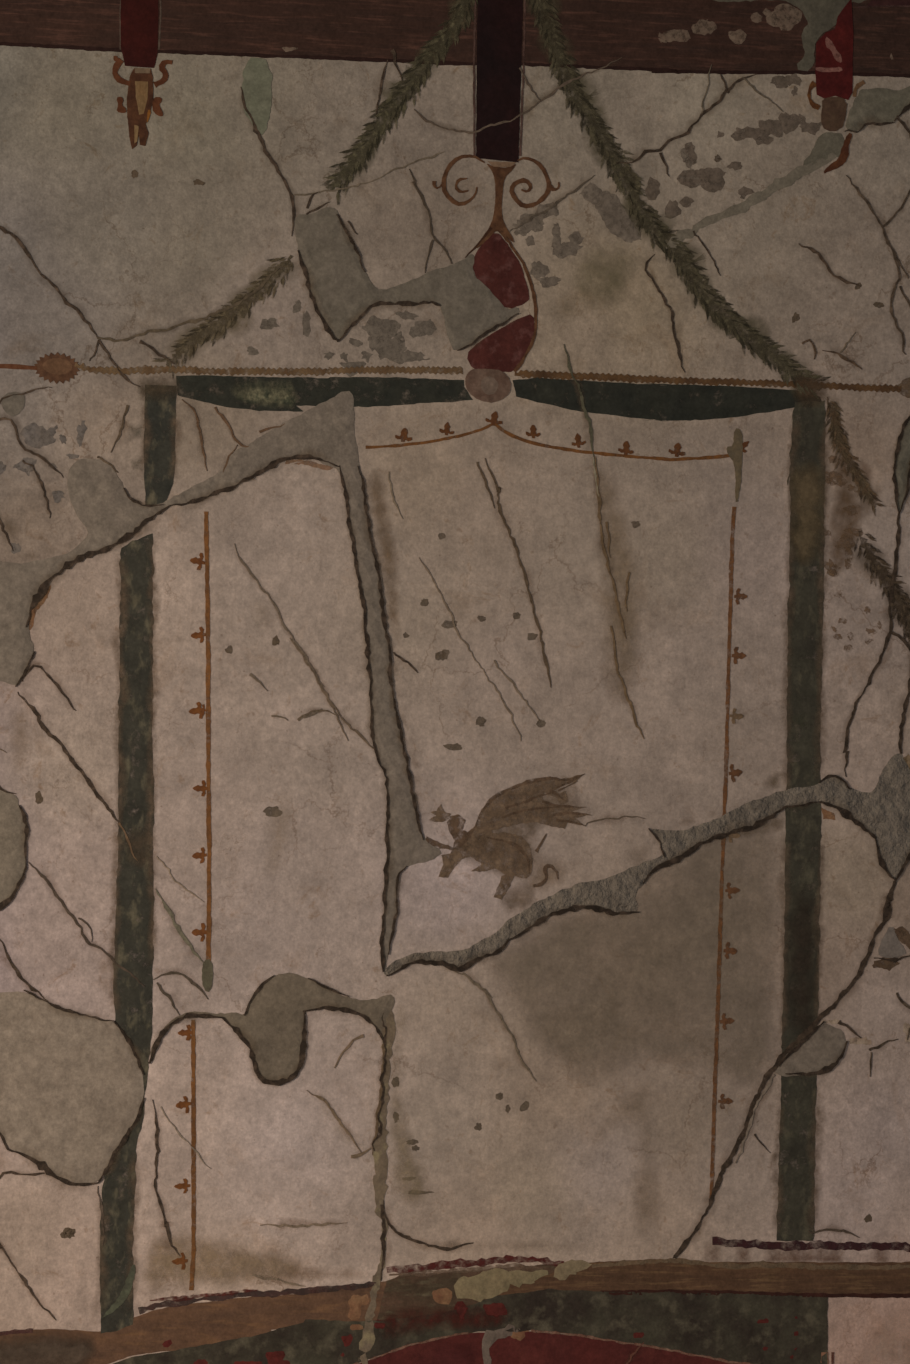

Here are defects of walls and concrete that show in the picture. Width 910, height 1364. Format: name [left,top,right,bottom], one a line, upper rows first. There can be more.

peeling [658,3,802,44]
crack [509,64,783,232]
peeling [645,142,754,219]
peeling [717,112,822,145]
peeling [513,202,584,288]
crack [846,175,910,355]
peeling [324,310,436,377]
crack [0,49,644,1256]
crack [585,415,910,1259]
spalling [60,1227,76,1239]
crack [380,1200,473,1281]
crack [0,1244,56,1320]